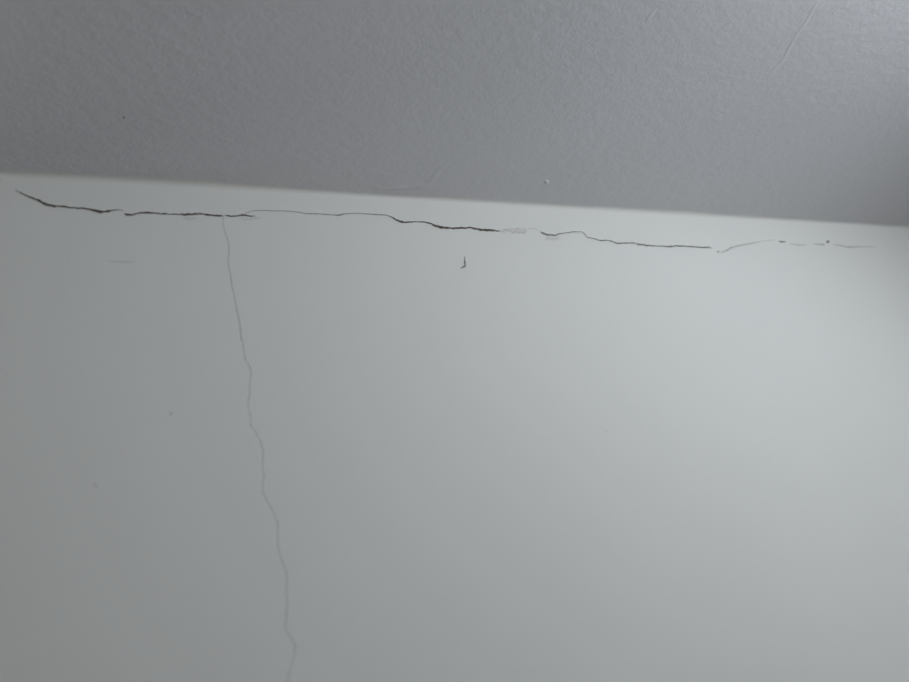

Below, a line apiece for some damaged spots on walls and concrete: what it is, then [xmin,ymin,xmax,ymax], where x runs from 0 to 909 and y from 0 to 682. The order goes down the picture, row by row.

crack [18,191,500,231]
crack [541,231,719,252]